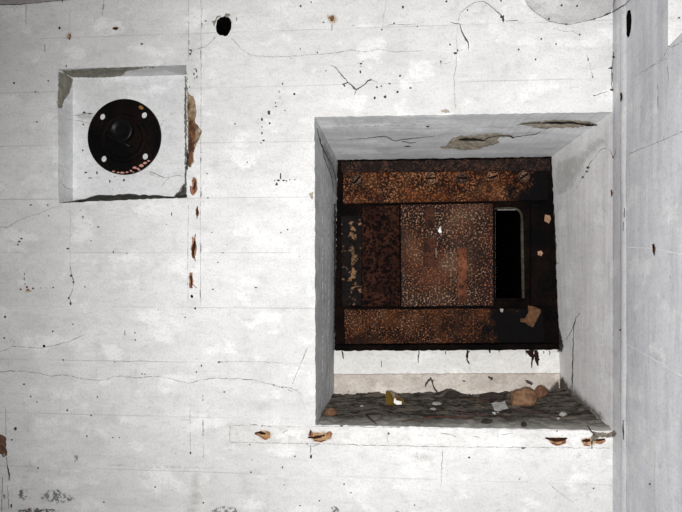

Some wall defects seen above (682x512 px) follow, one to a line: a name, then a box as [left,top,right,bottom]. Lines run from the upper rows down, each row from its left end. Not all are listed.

crack [280,51,377,95]
crack [440,1,518,109]
spalling [440,120,597,150]
spalling [587,426,616,449]